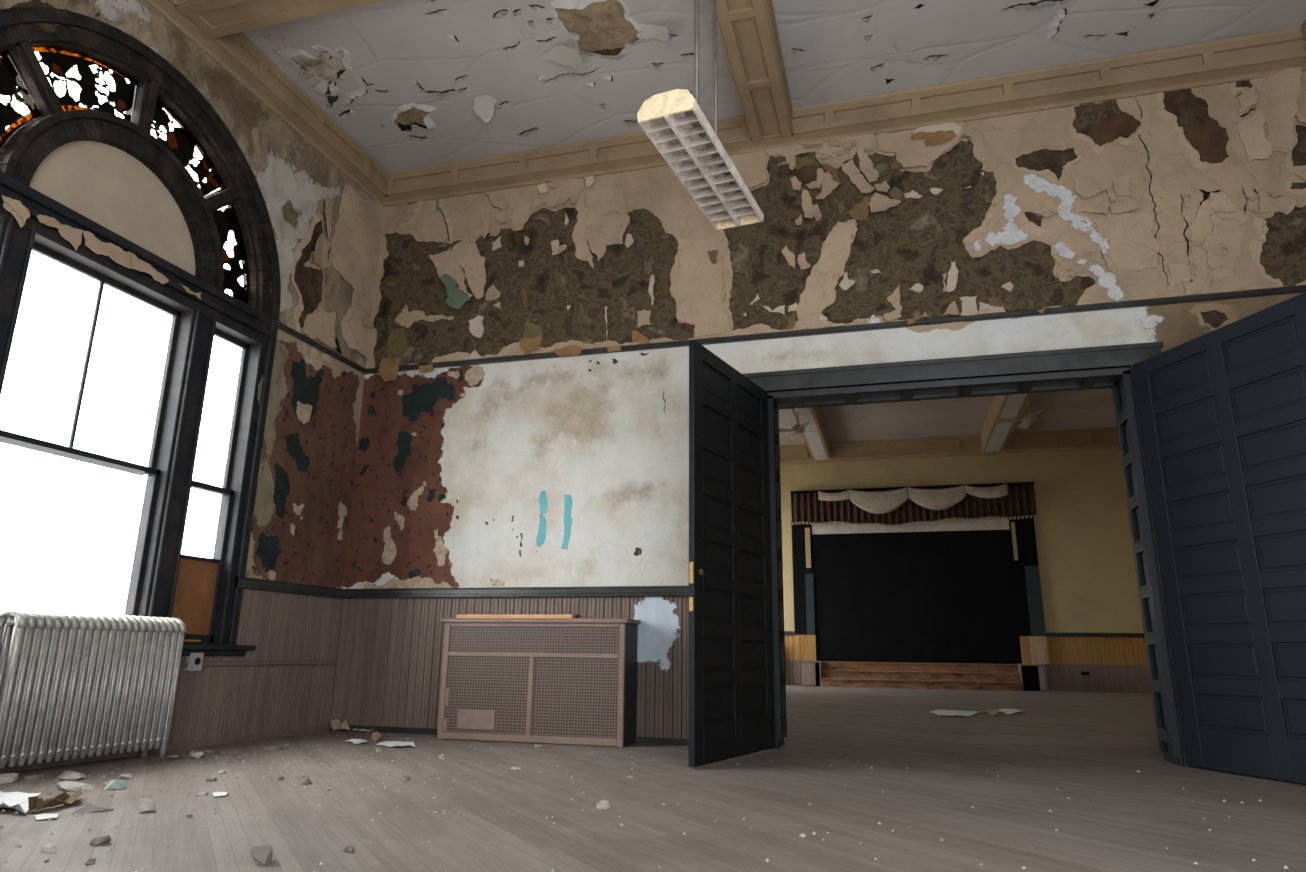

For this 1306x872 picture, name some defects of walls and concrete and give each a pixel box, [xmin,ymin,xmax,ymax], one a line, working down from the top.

leakage [0,0,87,33]
peeling [538,0,669,69]
spalling [245,67,1306,589]